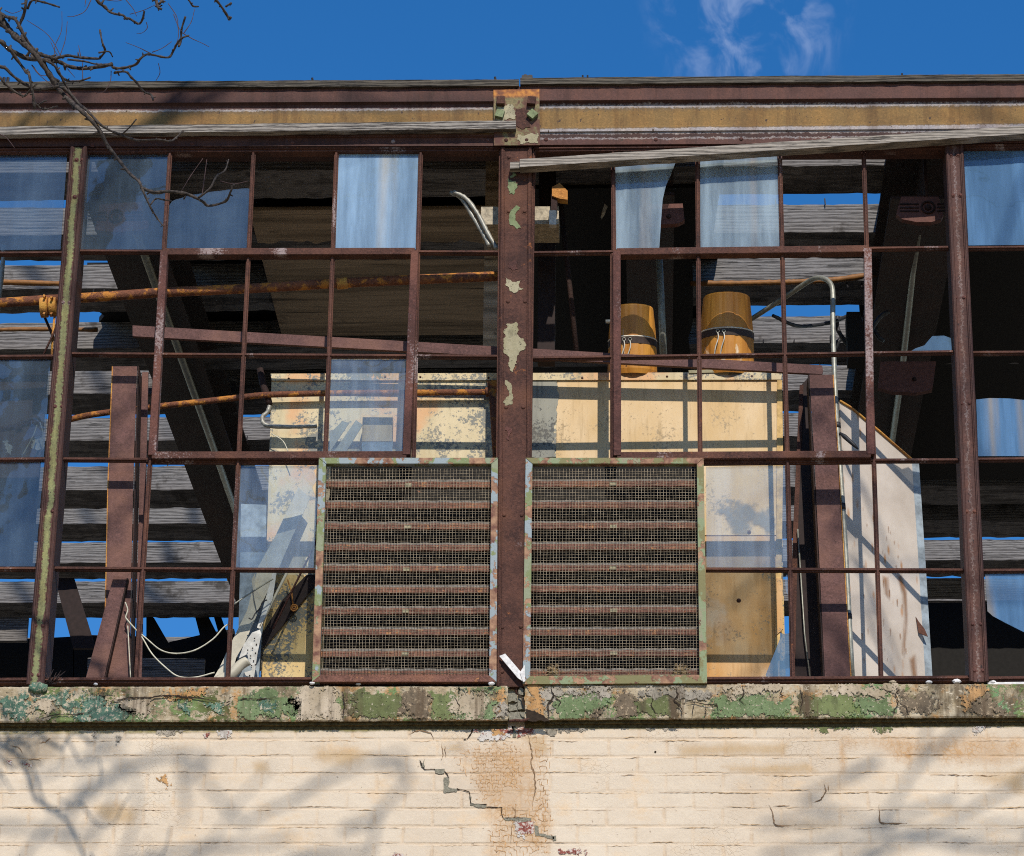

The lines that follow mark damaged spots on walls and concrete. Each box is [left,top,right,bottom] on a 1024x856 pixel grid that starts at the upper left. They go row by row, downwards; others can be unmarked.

peeling [495,104,539,144]
peeling [508,172,520,229]
peeling [505,278,524,293]
peeling [503,322,526,405]
peeling [0,687,153,734]
spalling [203,685,404,740]
peeling [427,684,619,744]
peeling [634,683,900,734]
crack [0,685,1024,846]